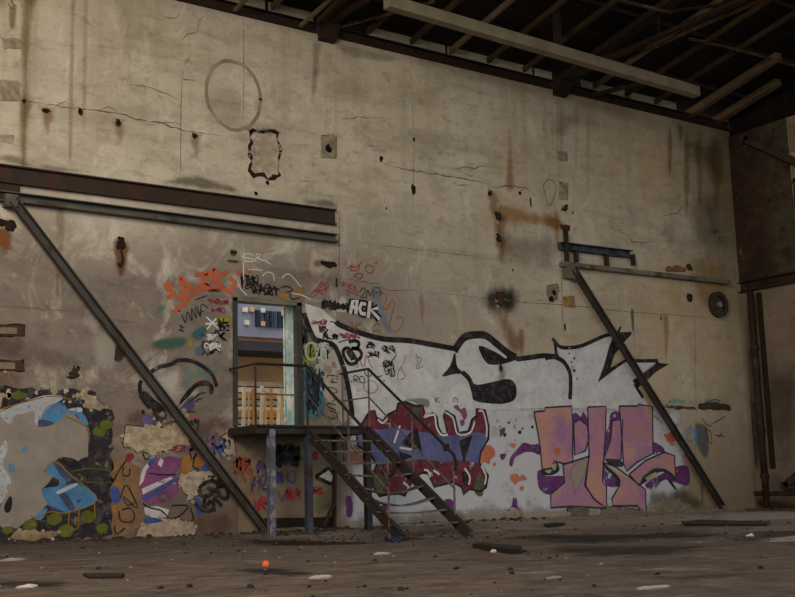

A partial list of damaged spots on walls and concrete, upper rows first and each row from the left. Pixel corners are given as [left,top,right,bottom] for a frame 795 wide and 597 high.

water stain [10,0,32,67]
crack [166,12,203,81]
crack [26,101,221,136]
spalling [247,128,284,185]
rust [115,243,127,275]
peeling [25,366,108,412]
peeling [118,417,191,459]
peeling [217,428,236,461]
peeling [173,470,217,504]
peeling [8,524,60,542]
peeling [136,514,198,537]